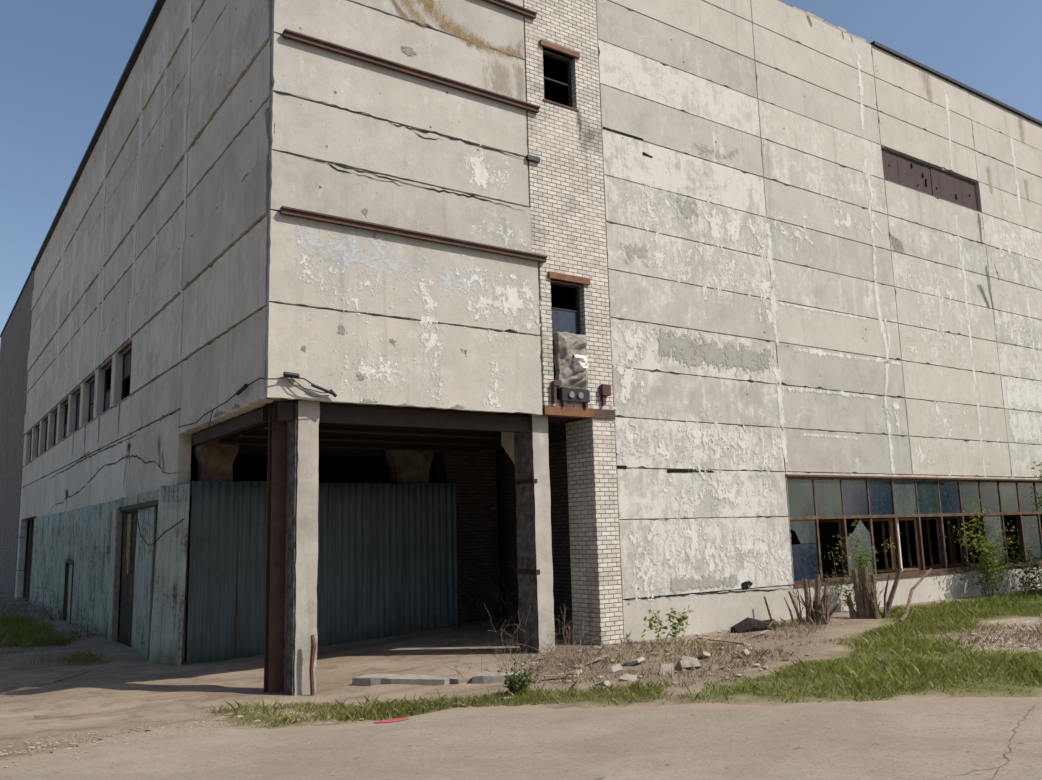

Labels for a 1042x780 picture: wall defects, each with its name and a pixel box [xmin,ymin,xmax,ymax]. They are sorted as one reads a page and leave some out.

rust [392,0,521,56]
crack [297,95,520,159]
spalling [603,127,653,158]
crack [292,153,523,211]
leakage [1010,117,1036,366]
peeling [285,239,548,408]
peeling [612,363,647,411]
peeling [653,327,775,379]
leakage [764,157,901,473]
leakage [953,215,992,478]
crack [48,436,178,513]
peeling [620,465,791,607]